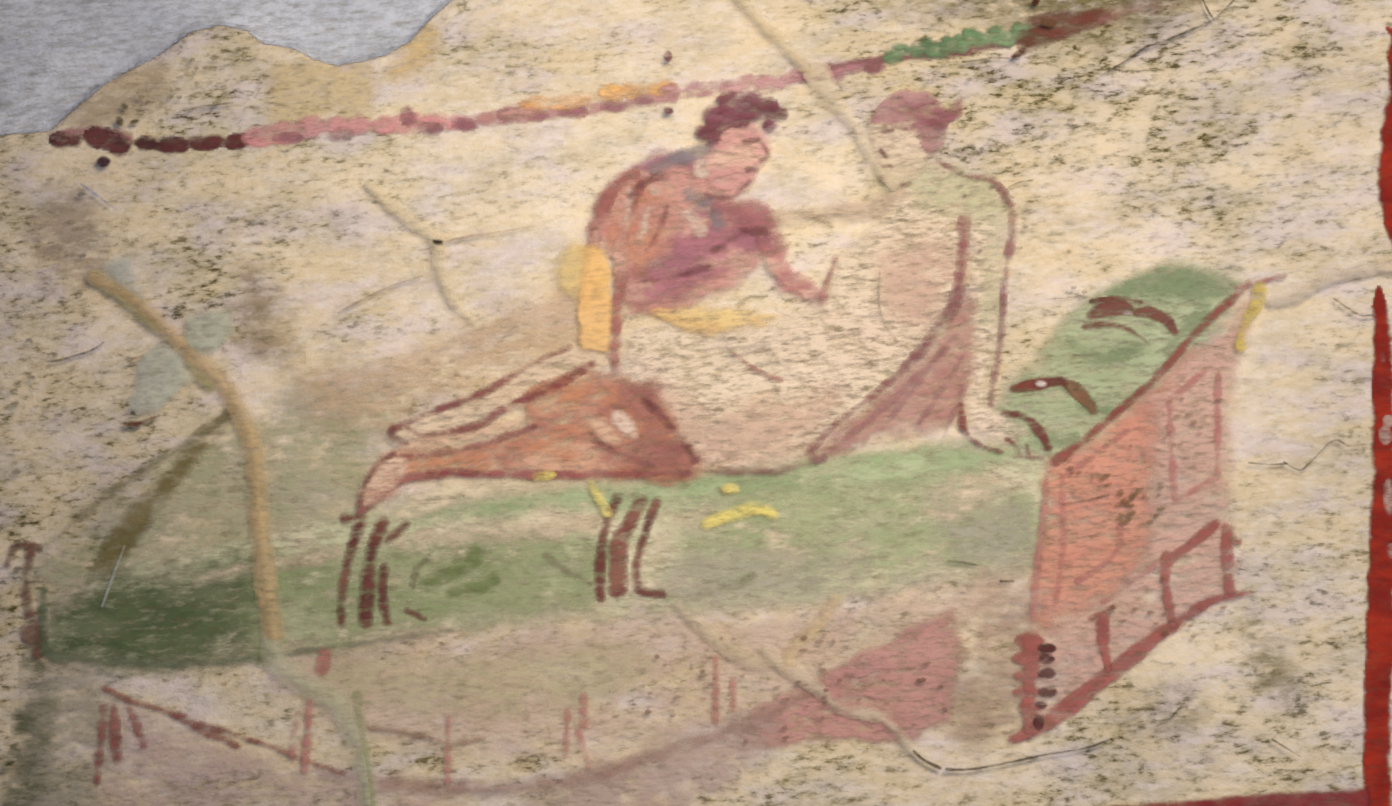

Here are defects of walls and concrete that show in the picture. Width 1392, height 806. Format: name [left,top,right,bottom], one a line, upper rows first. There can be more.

crack [1104,0,1234,74]
spalling [116,96,144,126]
crack [677,596,1109,771]